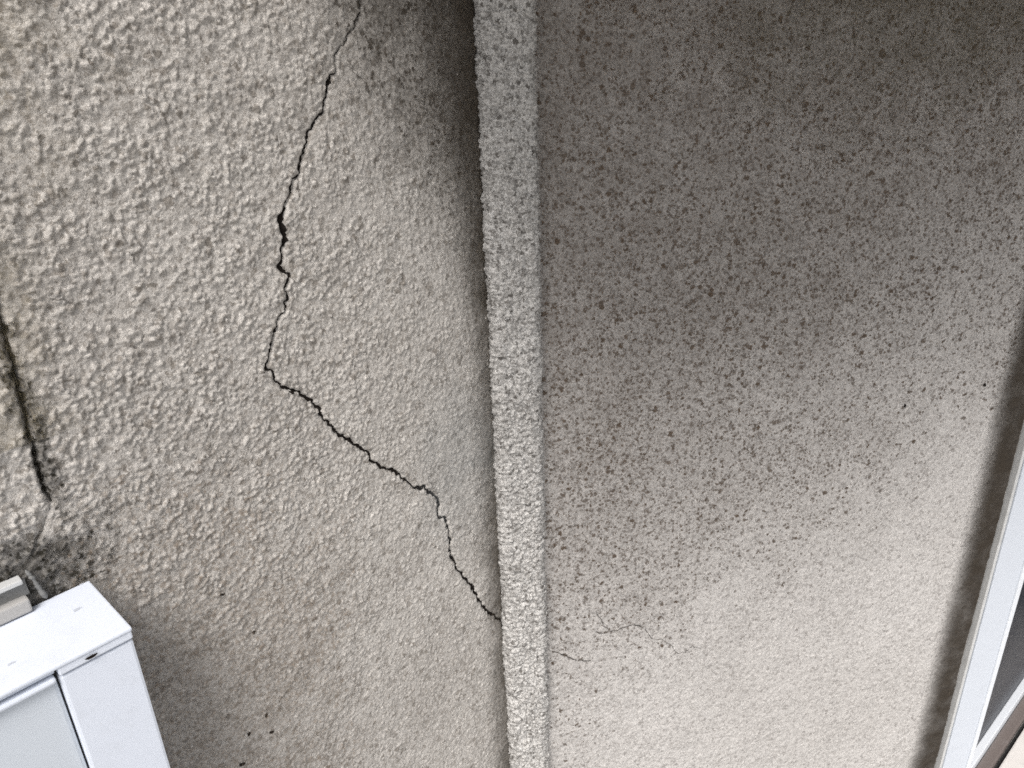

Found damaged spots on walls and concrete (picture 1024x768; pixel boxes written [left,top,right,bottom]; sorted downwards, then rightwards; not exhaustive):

crack [0,316,51,499]
crack [264,4,502,621]